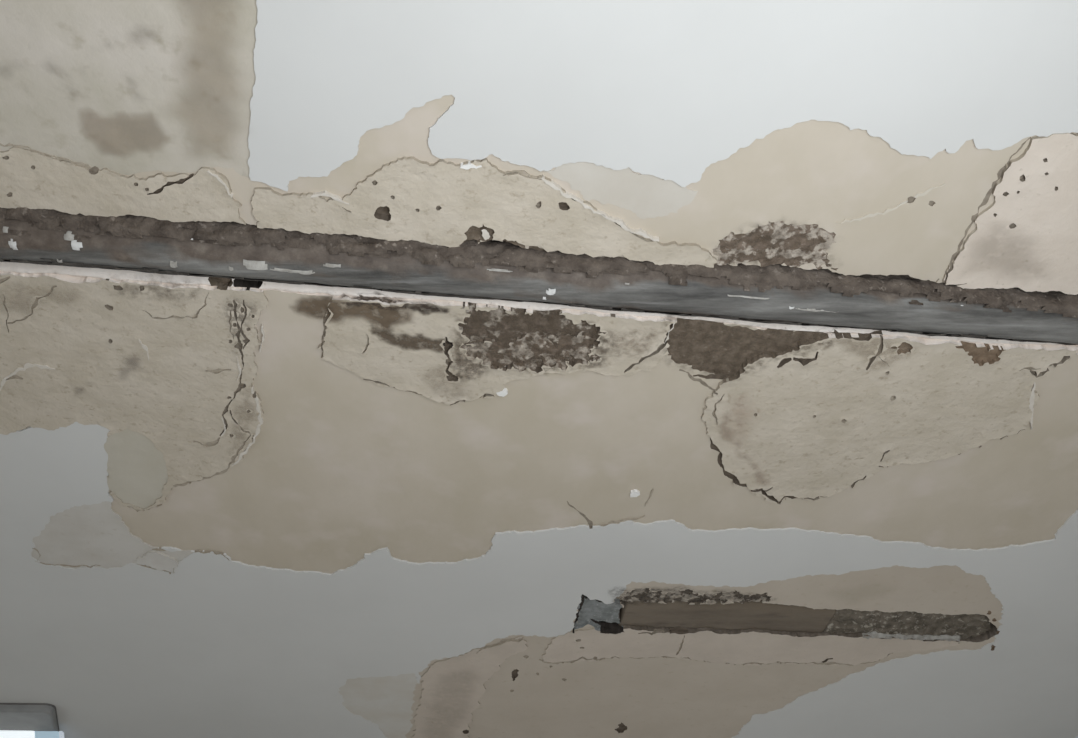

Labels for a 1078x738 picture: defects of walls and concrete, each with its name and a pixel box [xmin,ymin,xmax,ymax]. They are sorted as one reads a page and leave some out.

peeling [0,0,1078,295]
rust [0,207,1078,318]
crack [936,137,1032,286]
crack [143,293,265,487]
peeling [0,274,1078,574]
crack [624,322,675,373]
crack [679,369,823,504]
crack [777,329,889,370]
crack [851,450,904,488]
peeling [405,565,1003,738]